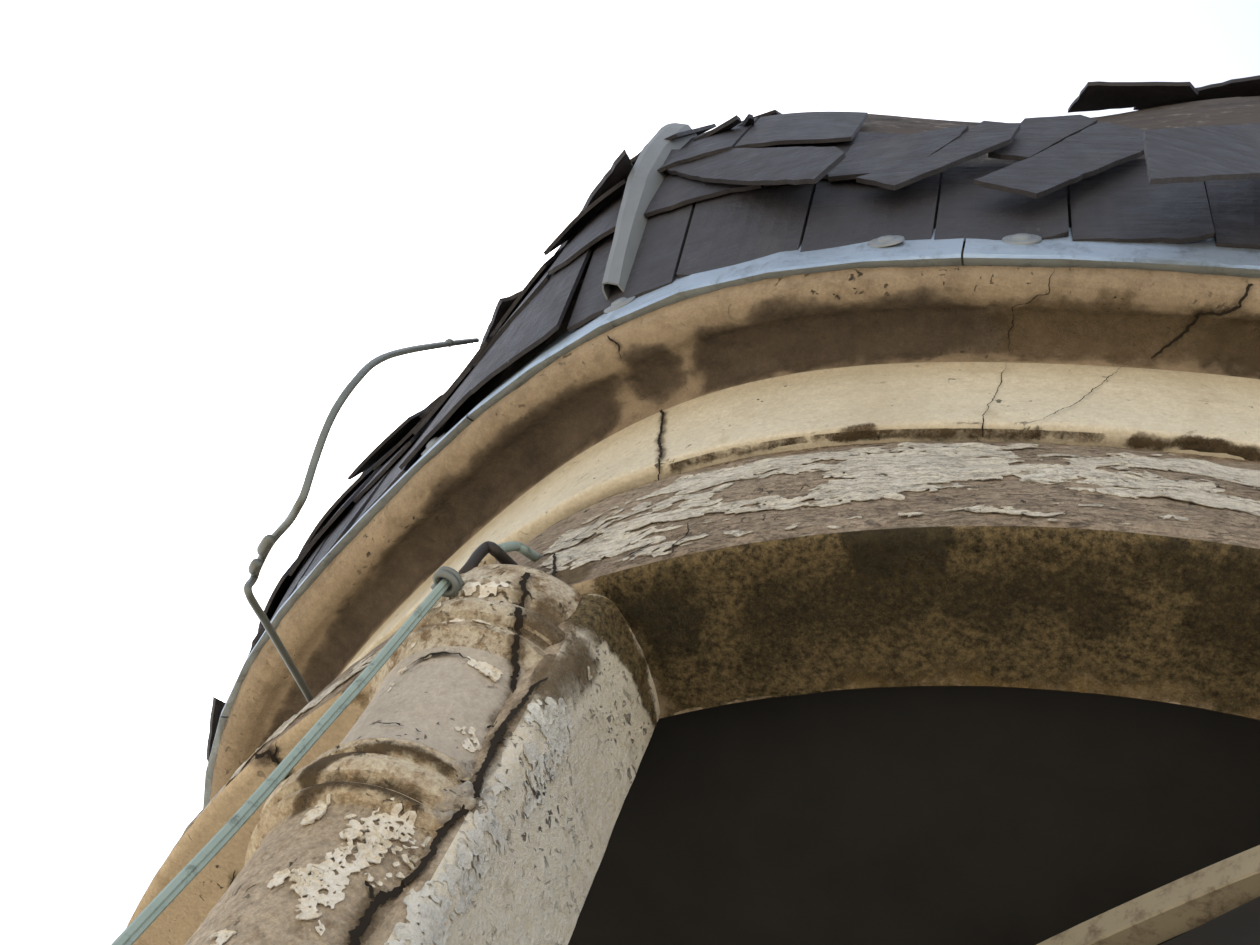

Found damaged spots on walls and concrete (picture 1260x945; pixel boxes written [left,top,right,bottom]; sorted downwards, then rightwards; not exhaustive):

crack [981,273,1053,437]
crack [1151,283,1253,359]
crack [655,410,665,481]
damp [265,288,1260,740]
peeling [538,442,1260,574]
peeling [433,581,509,609]
crack [255,741,291,780]
peeling [192,649,382,823]
damp [290,777,422,817]
peeling [267,697,572,945]
crack [347,518,599,945]
peeling [467,656,503,682]